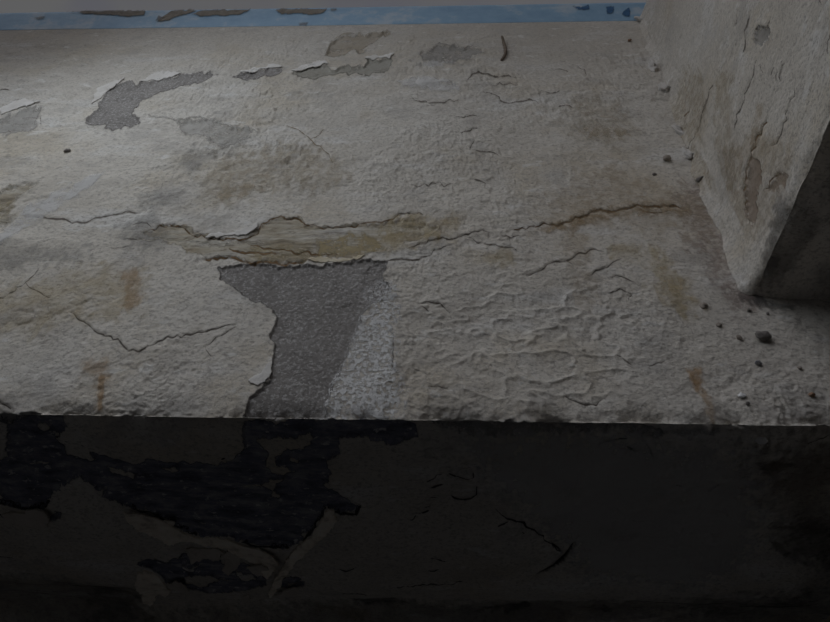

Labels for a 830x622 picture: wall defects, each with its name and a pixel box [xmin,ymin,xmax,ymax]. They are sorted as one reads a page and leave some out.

peeling [233,30,394,81]
peeling [0,98,42,135]
peeling [85,70,257,148]
crack [388,204,684,261]
crack [74,314,235,356]
peeling [0,215,440,606]
crack [498,512,573,573]